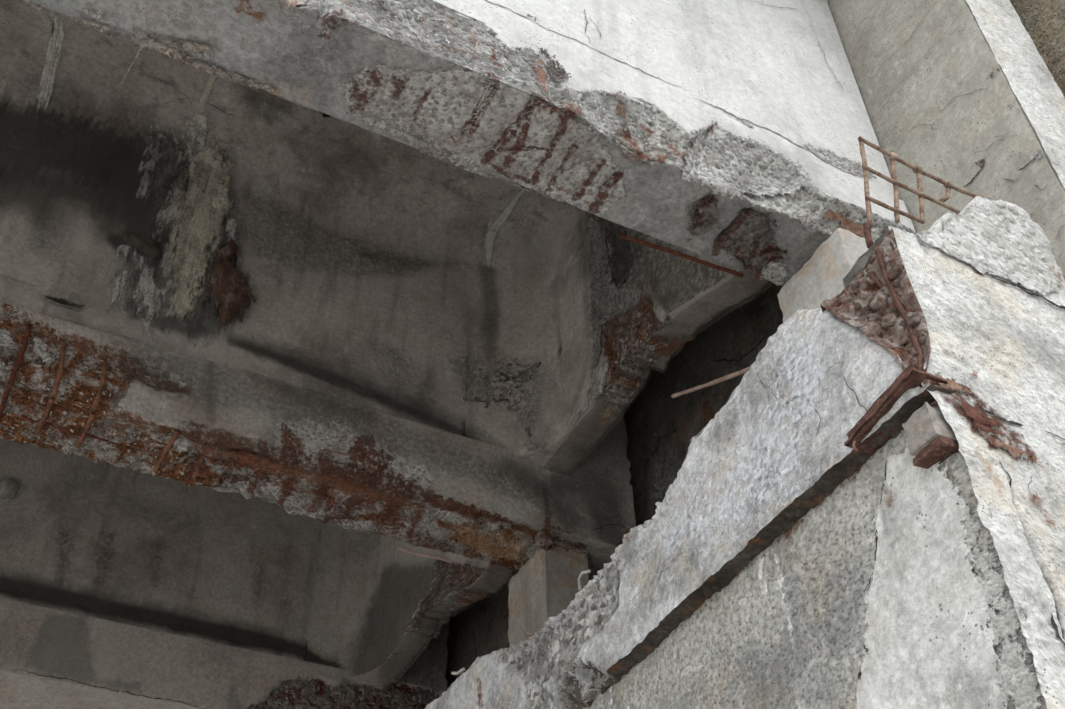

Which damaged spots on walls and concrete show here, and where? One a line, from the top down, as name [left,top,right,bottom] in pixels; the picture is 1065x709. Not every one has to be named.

water stain [34,13,64,112]
spalling [20,0,281,97]
water stain [0,174,97,307]
spalling [278,0,1061,430]
corrosion [863,222,874,249]
crack [944,252,1065,309]
water stain [230,340,472,439]
corrosion [839,363,1044,485]
spalling [0,303,538,709]
corrosion [174,421,587,563]
spalling [498,561,620,709]